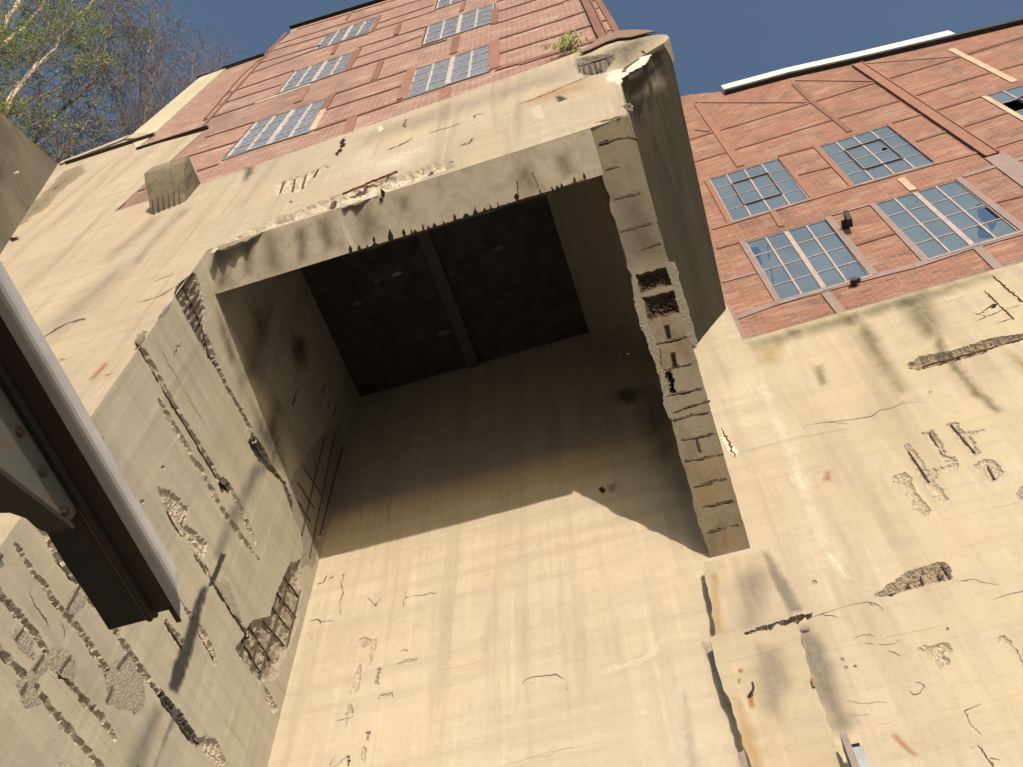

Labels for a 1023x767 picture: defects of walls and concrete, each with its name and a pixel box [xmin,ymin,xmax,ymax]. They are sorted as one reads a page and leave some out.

spalling [632,262,711,422]
spalling [907,333,1023,371]
crack [975,304,1021,323]
crack [741,401,925,452]
spalling [156,272,345,714]
spalling [892,421,1006,517]
spalling [874,561,953,597]
spalling [0,528,228,767]
spalling [917,627,953,669]
crack [964,704,999,767]